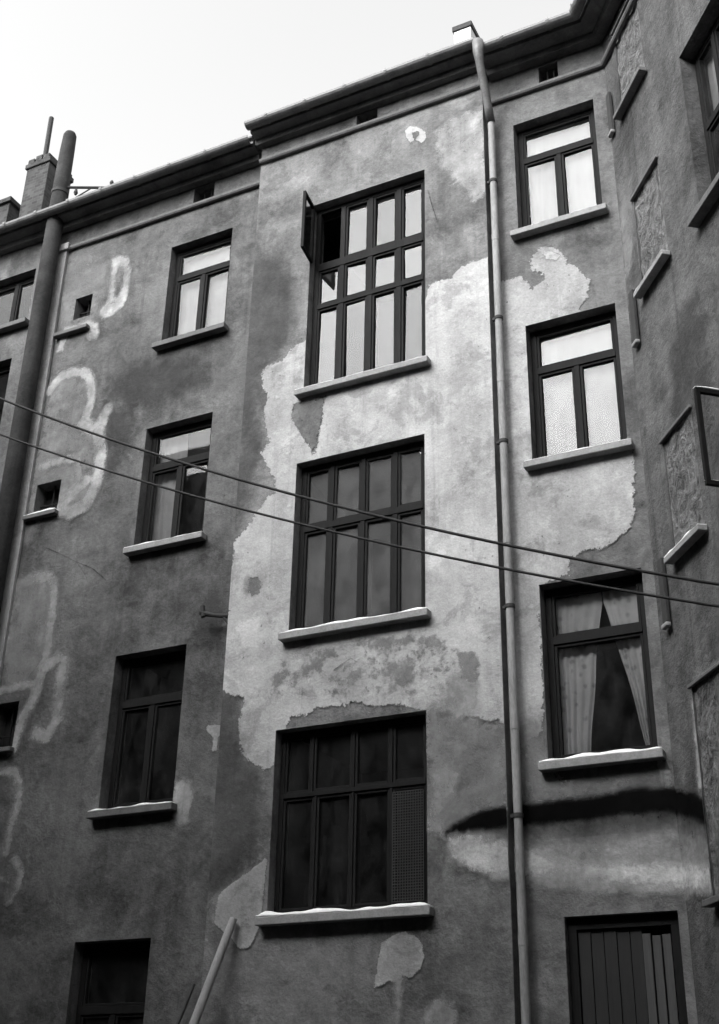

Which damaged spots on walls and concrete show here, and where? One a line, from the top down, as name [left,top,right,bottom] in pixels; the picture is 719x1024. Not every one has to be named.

flaking render [405,110,485,202]
flaking render [223,246,637,771]
flaking render [206,723,220,752]
water stain [274,635,672,840]
flaking render [172,780,194,824]
flaking render [214,858,268,950]
flaking render [373,931,425,1023]